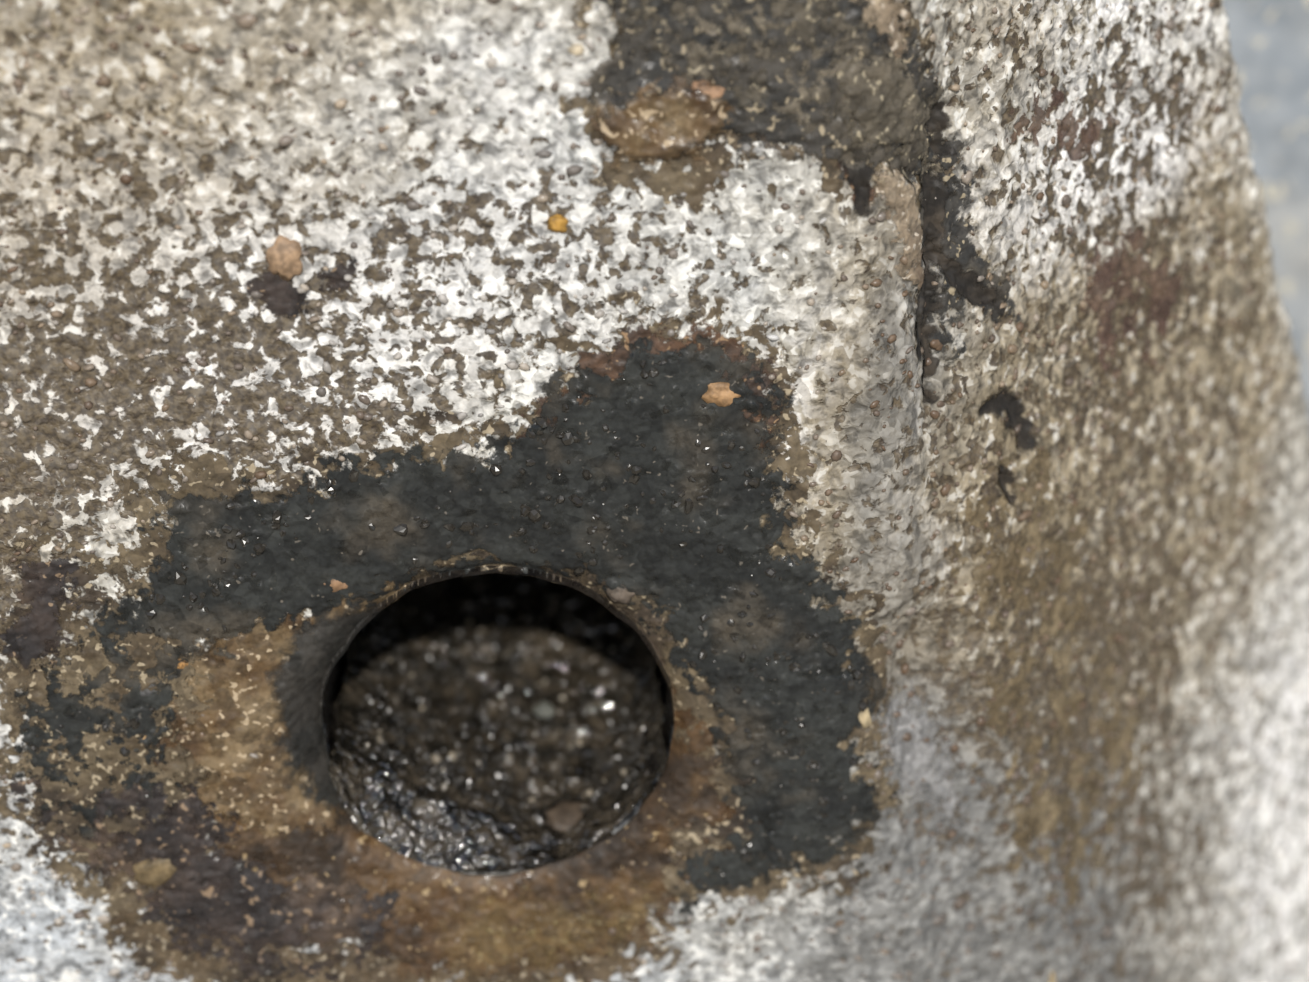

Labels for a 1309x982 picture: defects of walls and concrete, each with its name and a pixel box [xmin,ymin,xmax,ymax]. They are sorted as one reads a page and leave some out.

water stain [559,0,963,226]
crack [841,164,877,216]
crack [903,101,1021,404]
water stain [0,289,918,969]